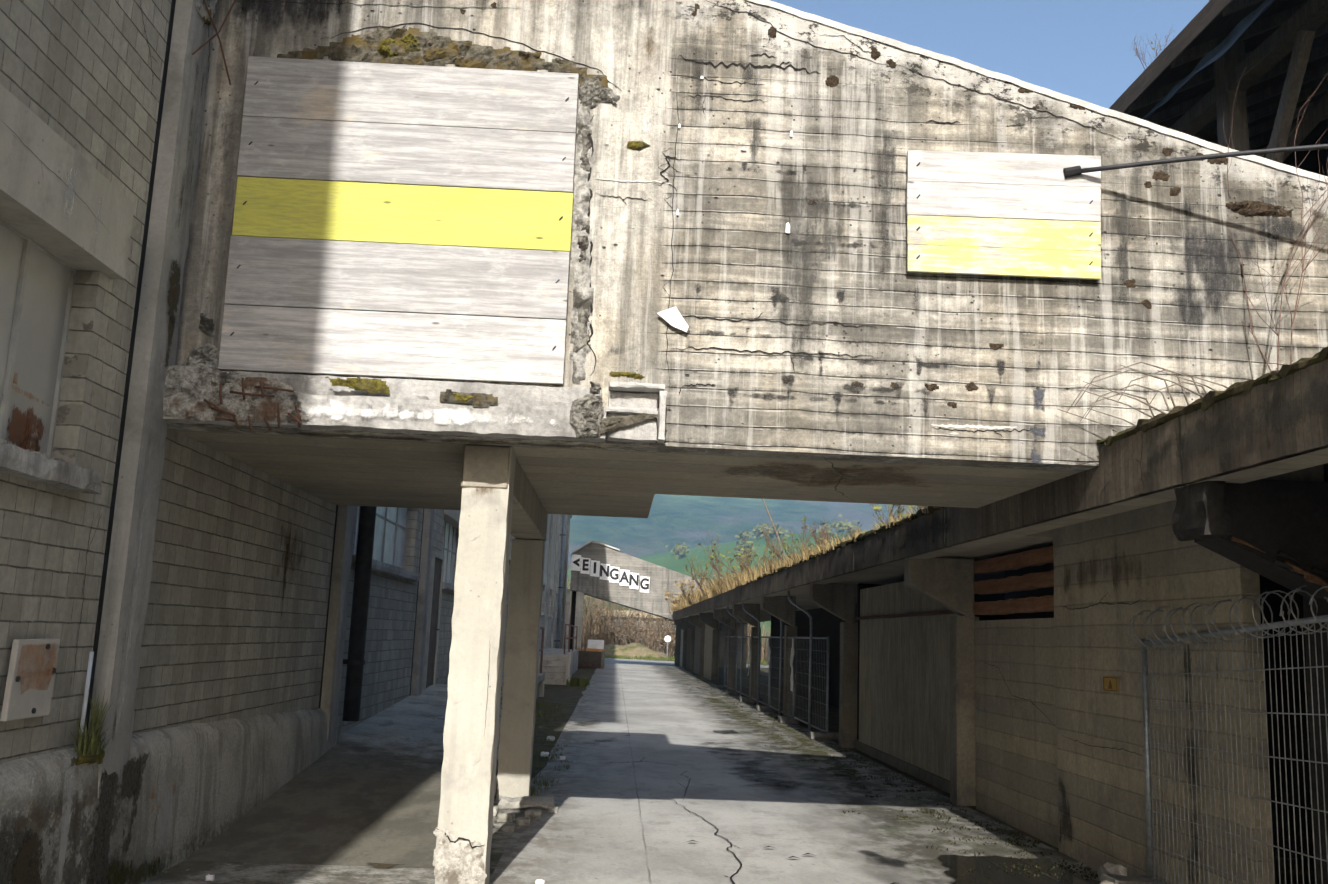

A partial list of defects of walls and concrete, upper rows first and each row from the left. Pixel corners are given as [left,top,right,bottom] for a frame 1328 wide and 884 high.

rust [7,374,44,452]
damp [165,314,174,367]
spalling [163,313,308,431]
spalling [277,27,658,439]
damp [772,165,843,395]
damp [878,134,895,272]
damp [12,832,51,884]
damp [91,752,150,884]
spalling [433,826,487,884]
crack [592,758,742,884]